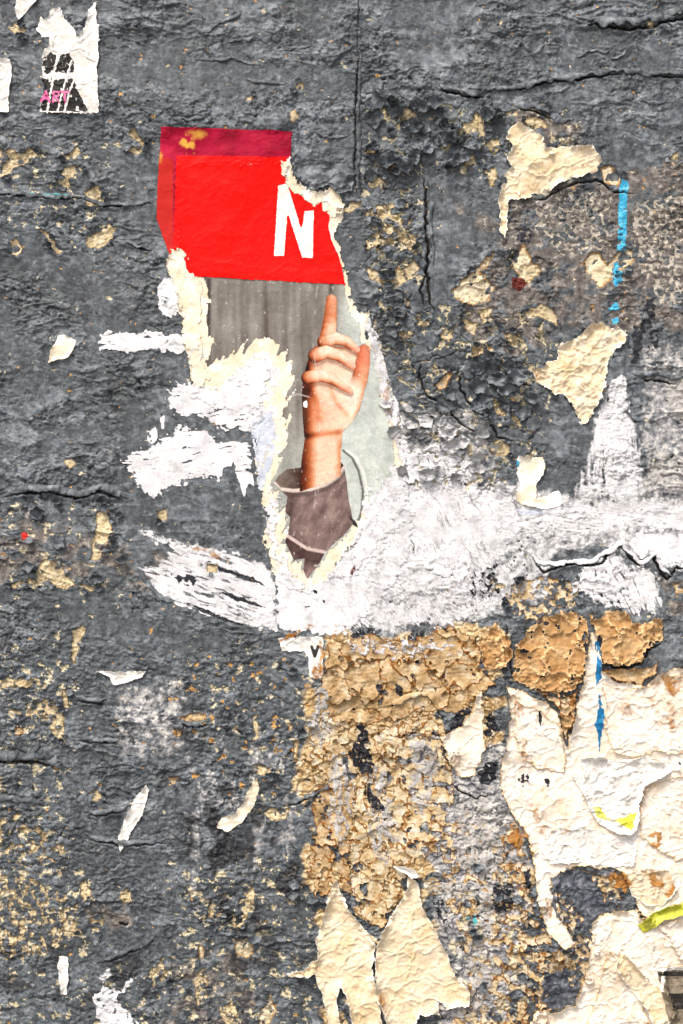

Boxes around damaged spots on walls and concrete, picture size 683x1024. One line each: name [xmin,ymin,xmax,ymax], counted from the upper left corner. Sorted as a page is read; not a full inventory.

crack [353,7,361,196]
peeling [292,91,551,482]
crack [419,178,437,314]
peeling [522,302,561,326]
peeling [534,165,683,305]
peeling [256,764,278,781]
peeling [253,803,290,825]
peeling [287,574,664,1024]